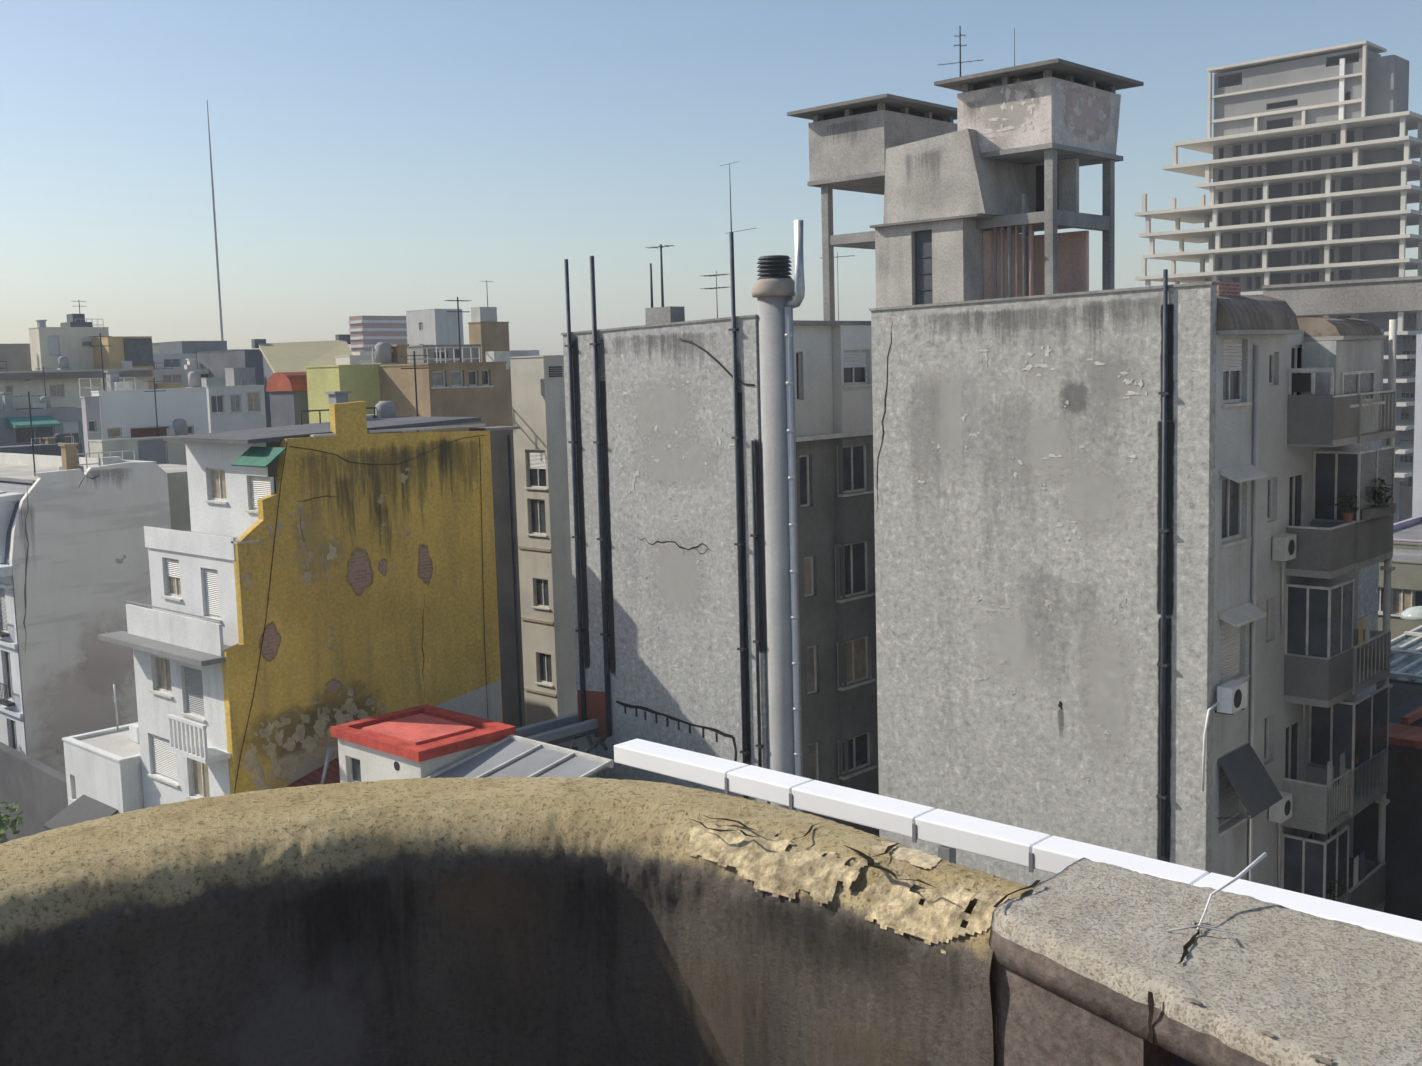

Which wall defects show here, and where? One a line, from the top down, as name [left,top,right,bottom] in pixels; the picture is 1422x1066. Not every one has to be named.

flaking render [260,492,387,597]
flaking render [404,525,433,586]
crack [638,538,711,554]
flaking render [259,621,282,662]
peeling [244,678,387,791]
crack [688,815,936,888]